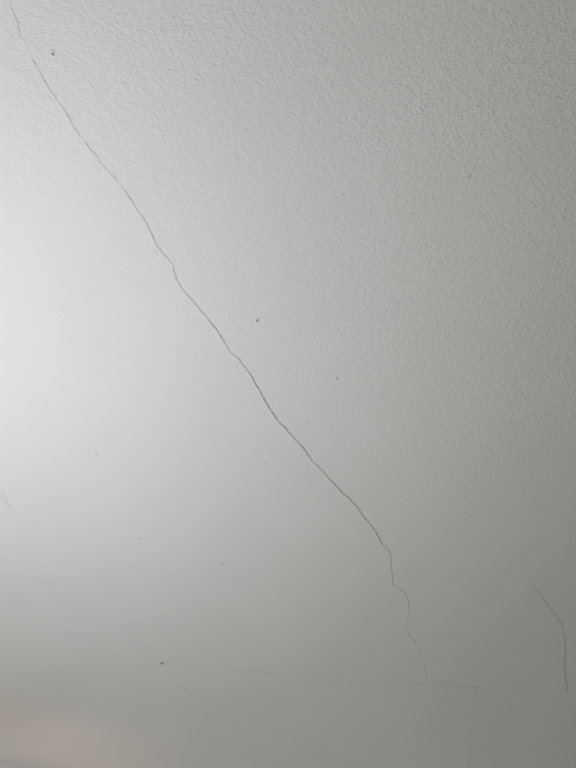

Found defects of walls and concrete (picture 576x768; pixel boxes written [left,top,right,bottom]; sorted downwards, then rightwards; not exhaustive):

crack [32,61,433,650]